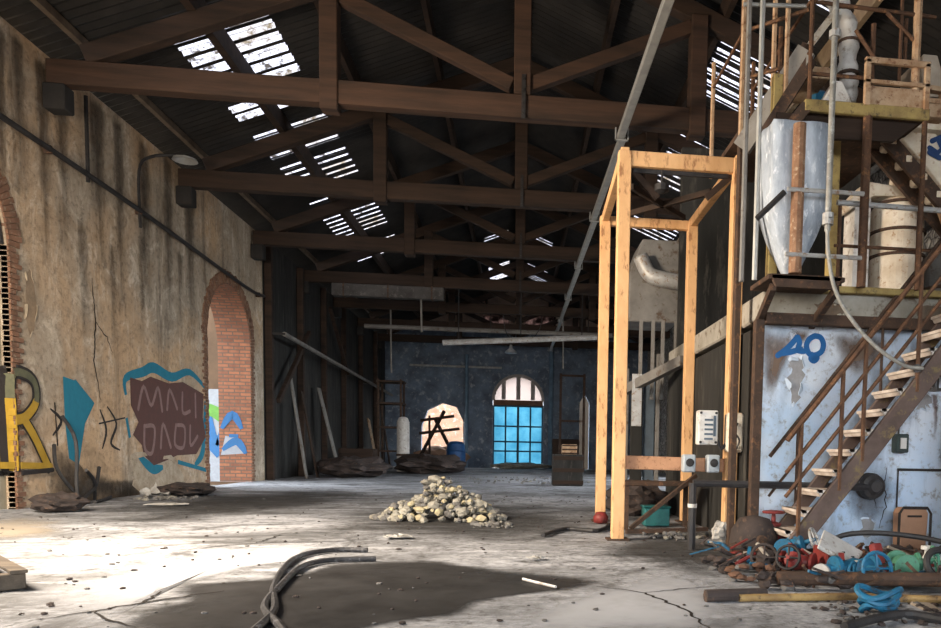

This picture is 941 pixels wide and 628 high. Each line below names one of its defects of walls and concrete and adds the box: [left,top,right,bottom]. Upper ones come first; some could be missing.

water stain [0,31,22,142]
water stain [36,62,66,169]
water stain [766,340,787,384]